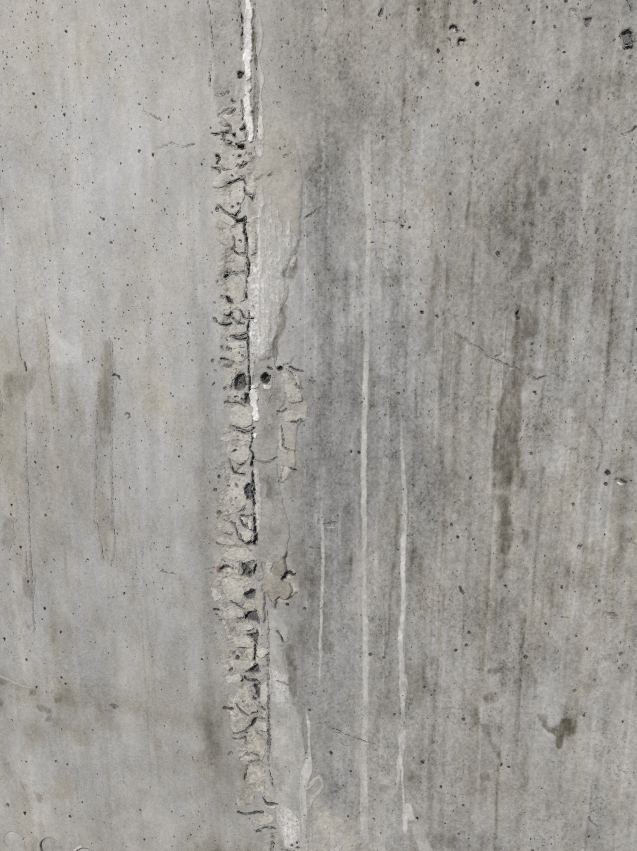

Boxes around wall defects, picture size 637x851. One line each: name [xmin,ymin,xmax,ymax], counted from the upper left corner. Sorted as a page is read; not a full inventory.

crack [236,70,244,79]
crack [237,13,245,50]
crack [242,216,251,392]
crack [249,427,257,534]
spalling [210,92,300,851]
spalling [267,352,315,483]
leakage [359,111,373,844]
leakage [488,302,542,581]
crack [266,610,284,787]
leakage [276,706,313,851]
leakage [378,410,455,851]
leakage [536,713,579,750]